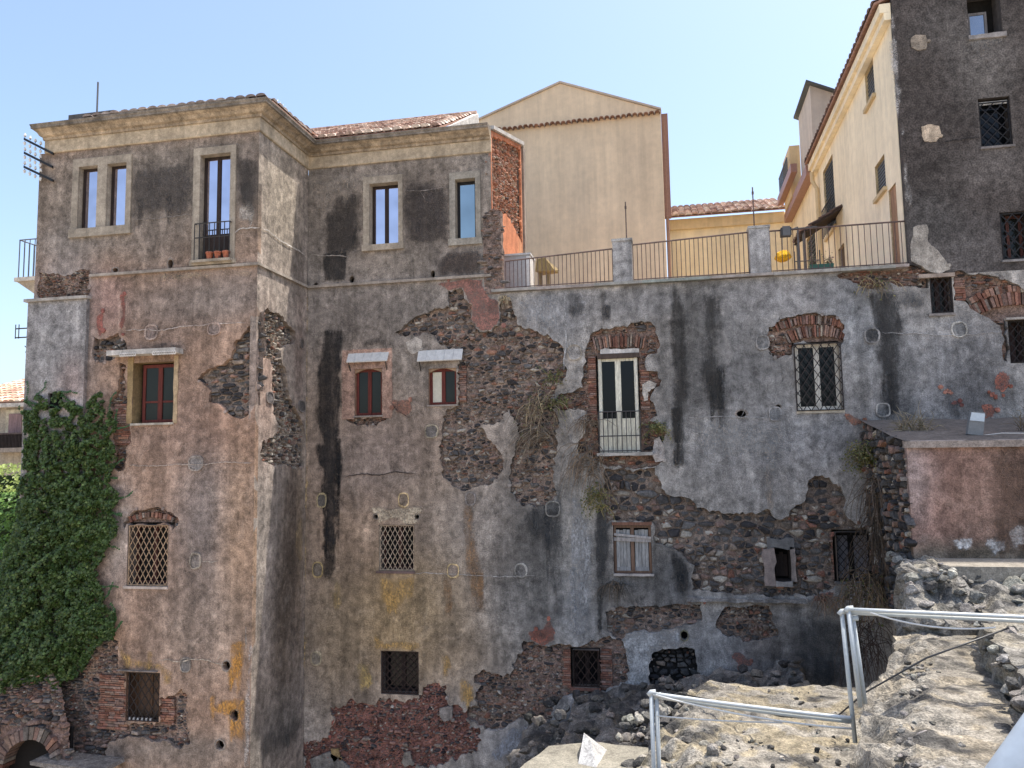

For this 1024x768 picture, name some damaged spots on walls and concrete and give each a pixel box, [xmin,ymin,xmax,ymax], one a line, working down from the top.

flaking render [36,269,92,298]
flaking render [197,311,303,470]
damp [315,179,359,281]
flaking render [837,266,931,289]
flaking render [947,263,1024,418]
damp [317,330,344,578]
crack [347,470,414,478]
flaking render [303,269,917,768]
flaking render [61,639,190,756]